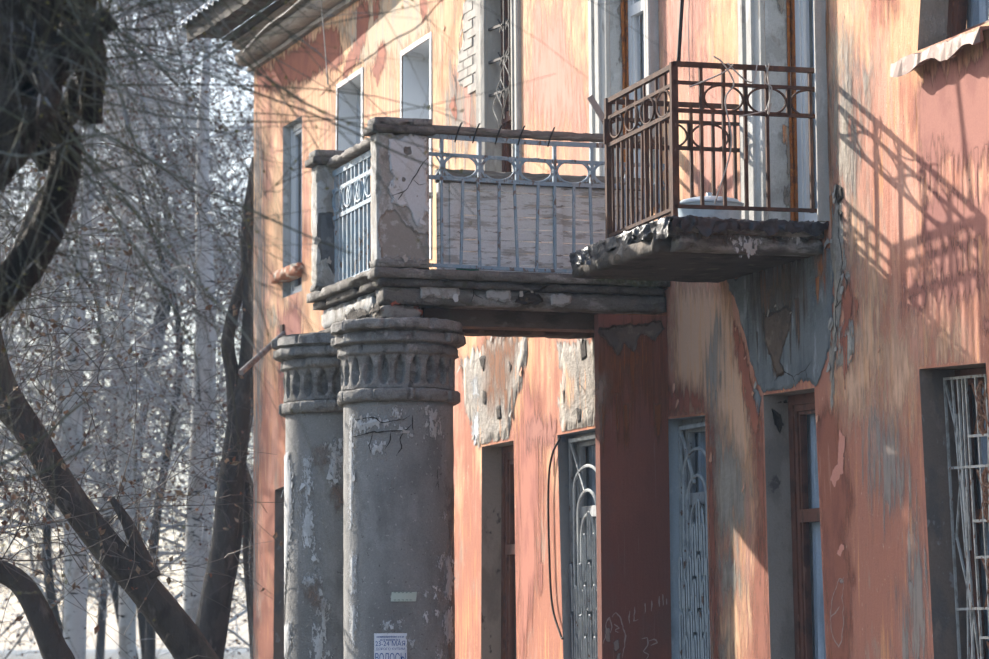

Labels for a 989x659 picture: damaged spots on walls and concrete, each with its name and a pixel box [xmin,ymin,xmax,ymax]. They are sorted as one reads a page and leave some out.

peeling [378,134,430,263]
peeling [824,20,914,434]
damp [903,41,989,314]
peeling [281,404,446,659]
flaking render [456,336,527,449]
peeling [557,282,759,659]
flaking render [764,304,792,378]
flaking render [772,400,788,433]
peeling [830,430,845,488]
peeling [420,552,456,659]